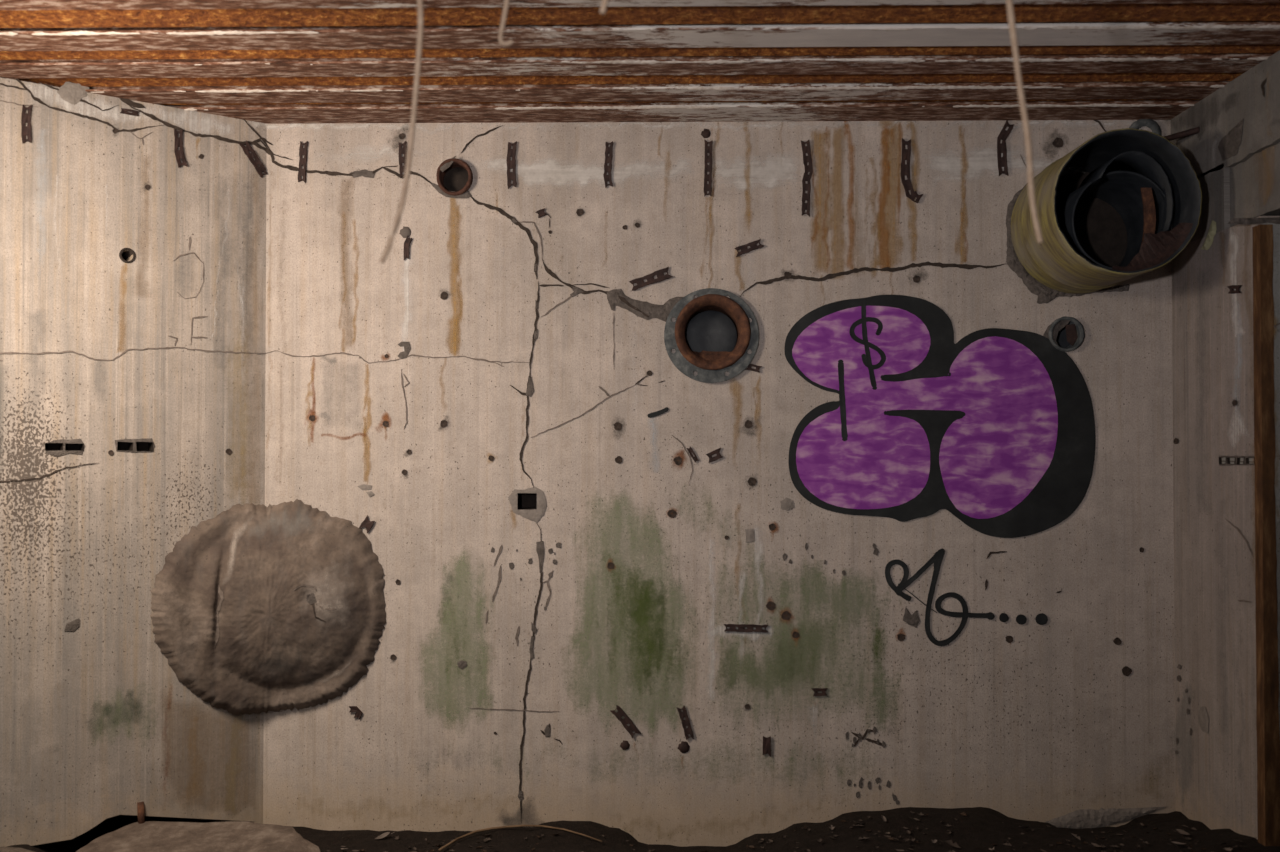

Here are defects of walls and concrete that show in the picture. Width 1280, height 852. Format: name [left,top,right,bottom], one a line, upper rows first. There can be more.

crack [0,77,433,184]
corrosion [811,121,854,272]
corrosion [873,122,917,272]
crack [0,196,639,488]
corrosion [449,198,462,355]
crack [470,523,560,818]